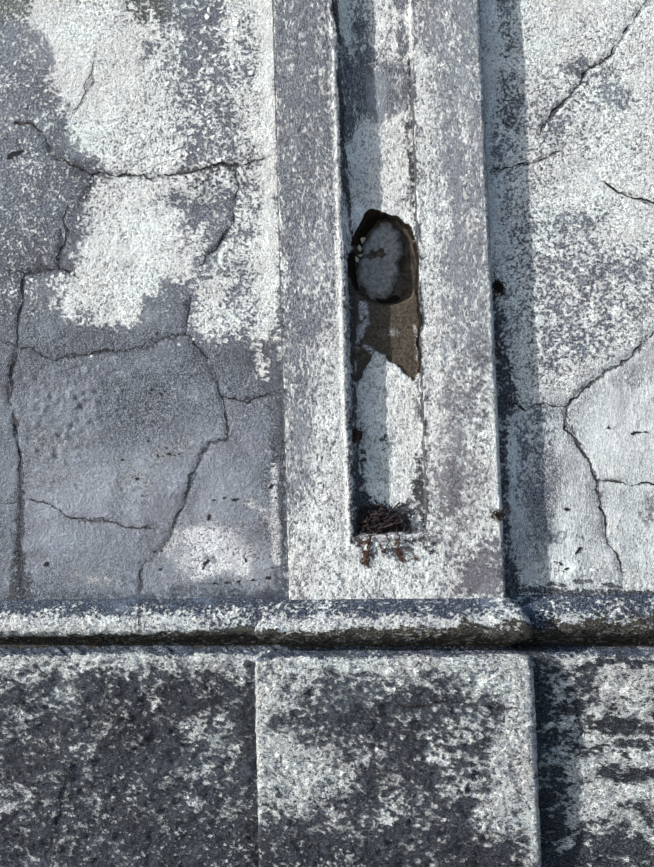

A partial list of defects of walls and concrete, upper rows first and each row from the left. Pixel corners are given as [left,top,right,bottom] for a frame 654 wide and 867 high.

crack [73,53,95,110]
crack [492,0,650,170]
crack [599,179,654,204]
crack [1,121,271,633]
spalling [347,209,422,382]
crack [501,331,654,589]
rust [359,532,419,568]